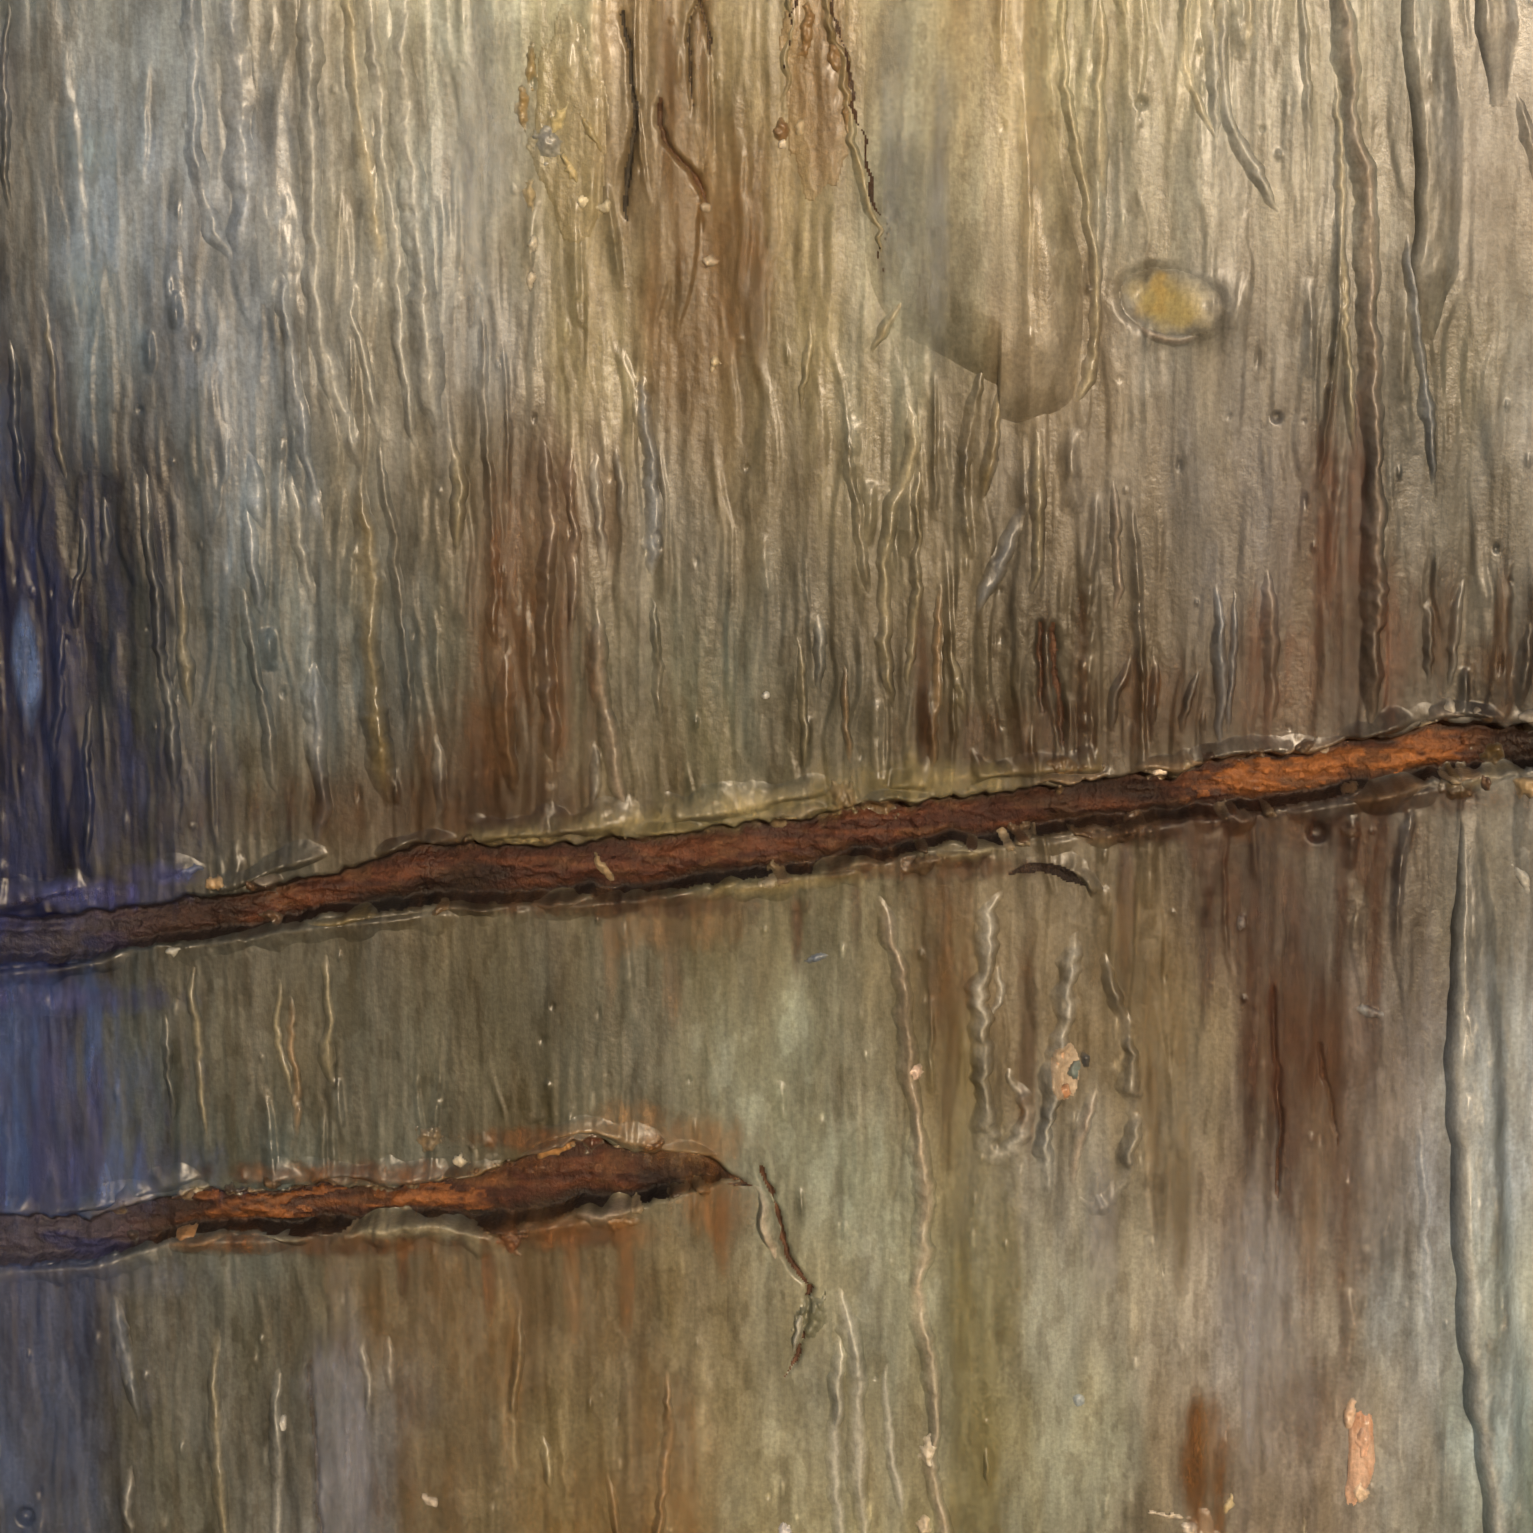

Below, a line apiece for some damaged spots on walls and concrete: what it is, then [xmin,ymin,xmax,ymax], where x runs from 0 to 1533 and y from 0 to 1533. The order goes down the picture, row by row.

crack [0,622,1533,988]
crack [0,1109,832,1377]
rust [1183,1406,1226,1515]
spalling [1343,1397,1375,1506]